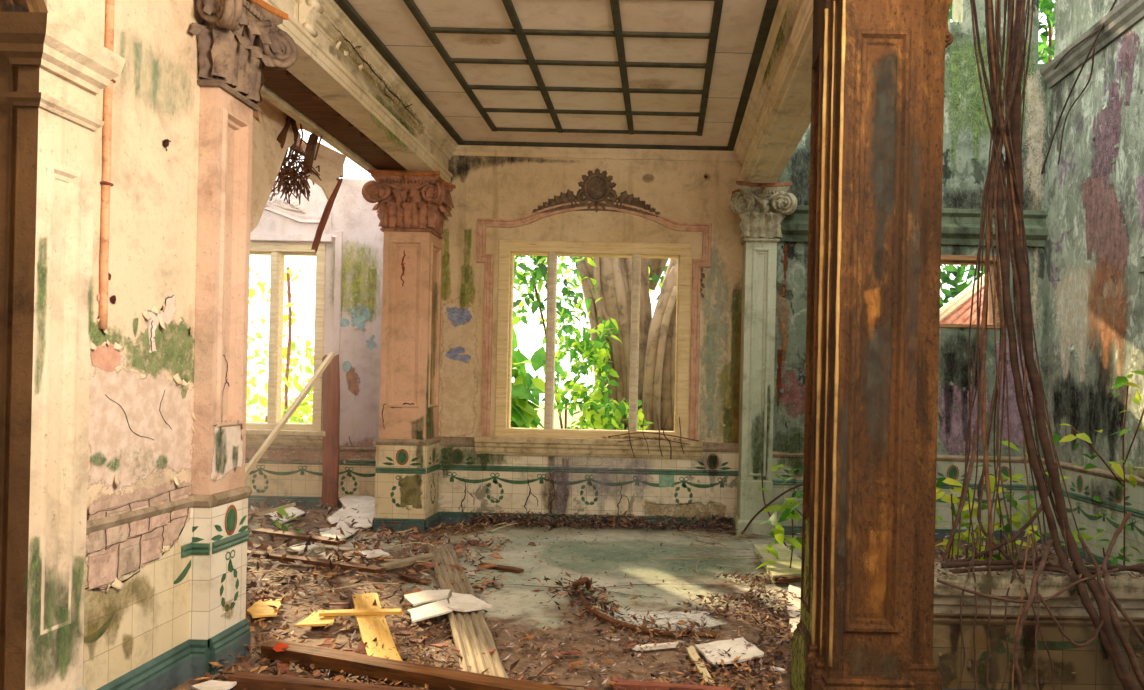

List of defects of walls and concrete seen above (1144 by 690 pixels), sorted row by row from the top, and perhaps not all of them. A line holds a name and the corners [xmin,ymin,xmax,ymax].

water stain [448,156,523,180]
peeling [1052,28,1140,381]
crack [399,250,407,286]
peeling [142,294,176,353]
peeling [341,303,376,349]
peeling [342,361,360,400]
peeling [439,298,478,437]
water stain [941,335,981,439]
water stain [1054,330,1126,462]
peeling [85,339,197,594]
water stain [548,456,569,512]